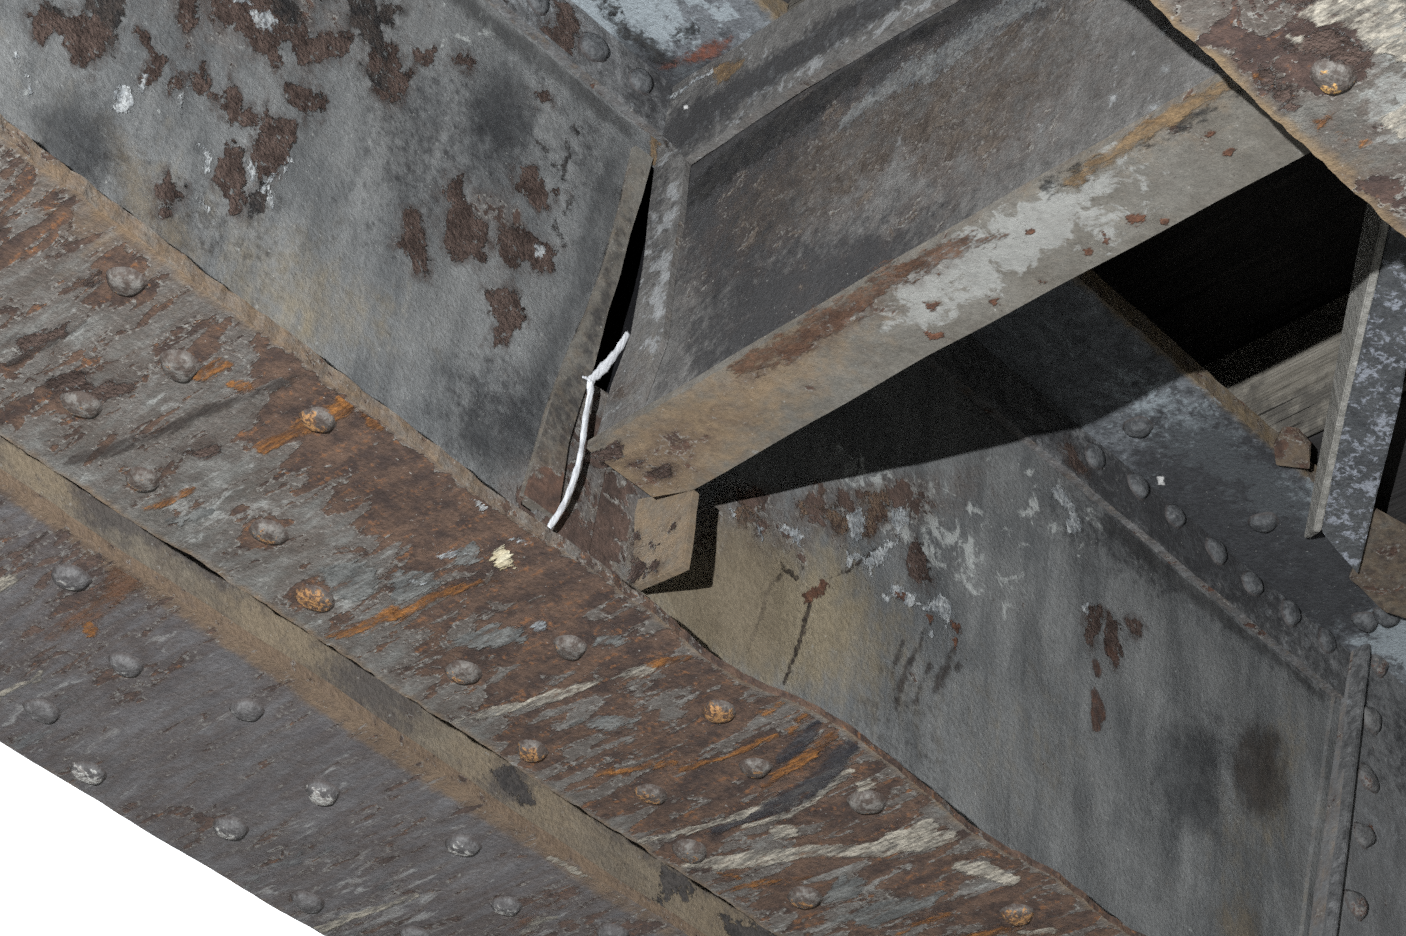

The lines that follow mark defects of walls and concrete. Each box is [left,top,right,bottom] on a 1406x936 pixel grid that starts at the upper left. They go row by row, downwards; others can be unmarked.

corrosion [539,0,581,58]
corrosion [1064,82,1231,187]
corrosion [1082,231,1110,256]
corrosion [1125,214,1169,226]
corrosion [802,579,830,605]
corrosion [1091,644,1119,731]